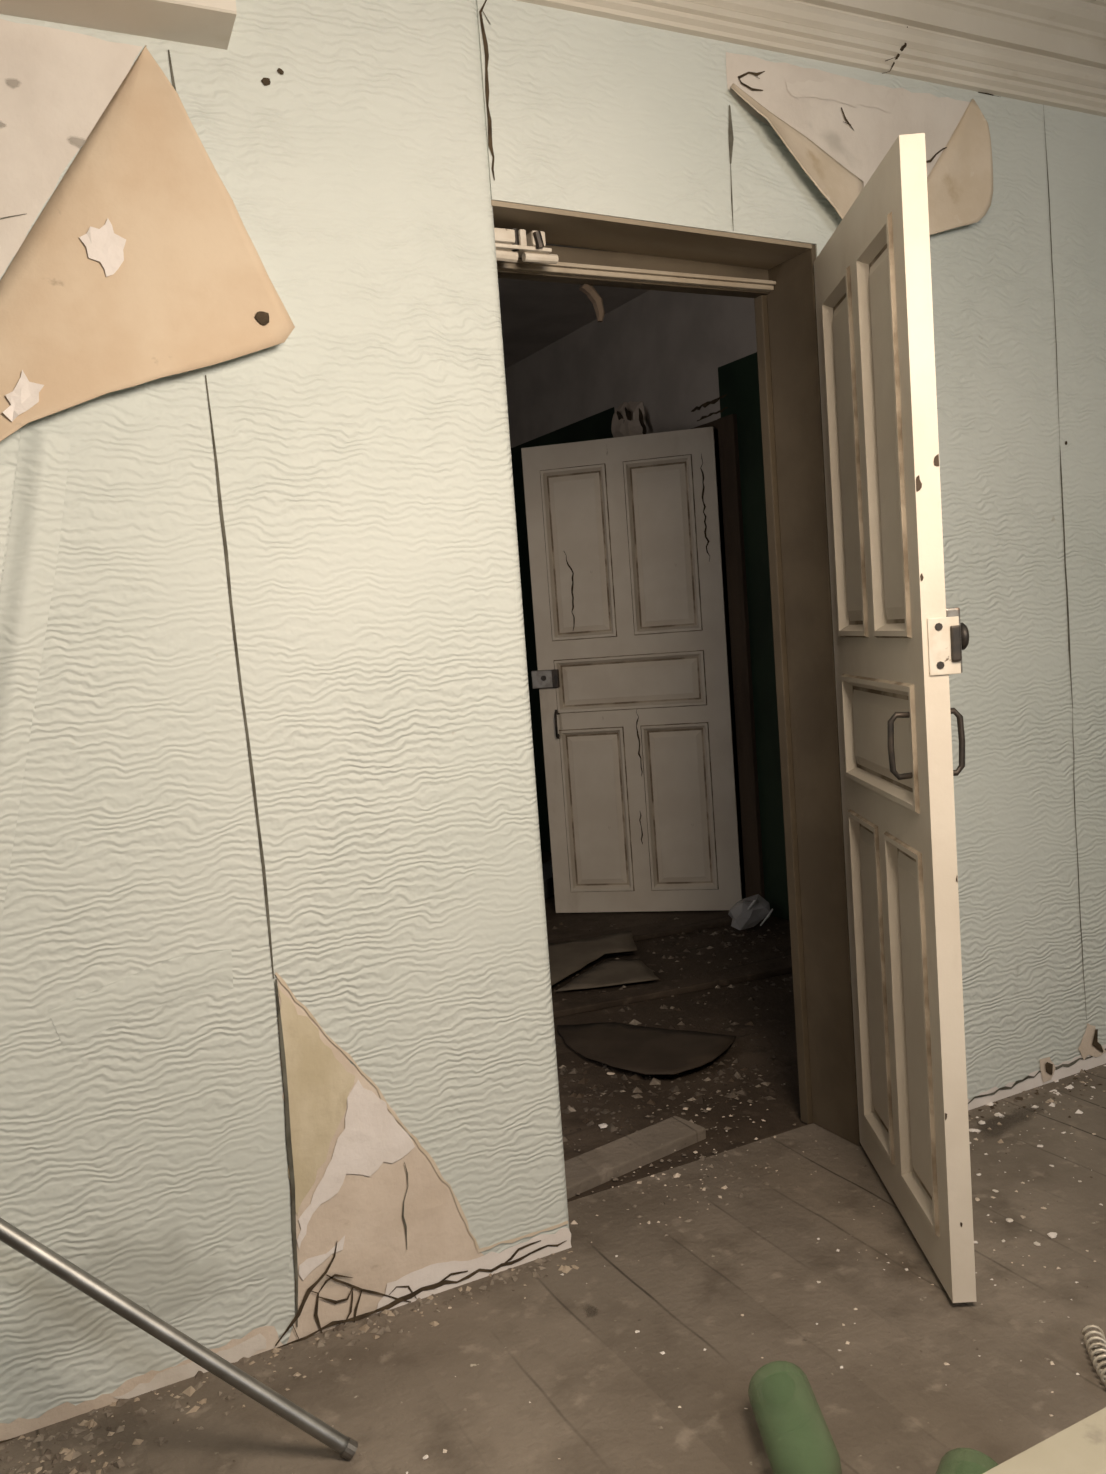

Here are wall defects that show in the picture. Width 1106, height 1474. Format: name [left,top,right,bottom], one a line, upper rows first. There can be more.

peeling [0,19,295,442]
flaking render [726,52,993,235]
flaking render [968,1023,1106,1110]
flaking render [210,972,572,1363]
crack [275,1240,567,1348]
flaking render [0,1359,208,1443]